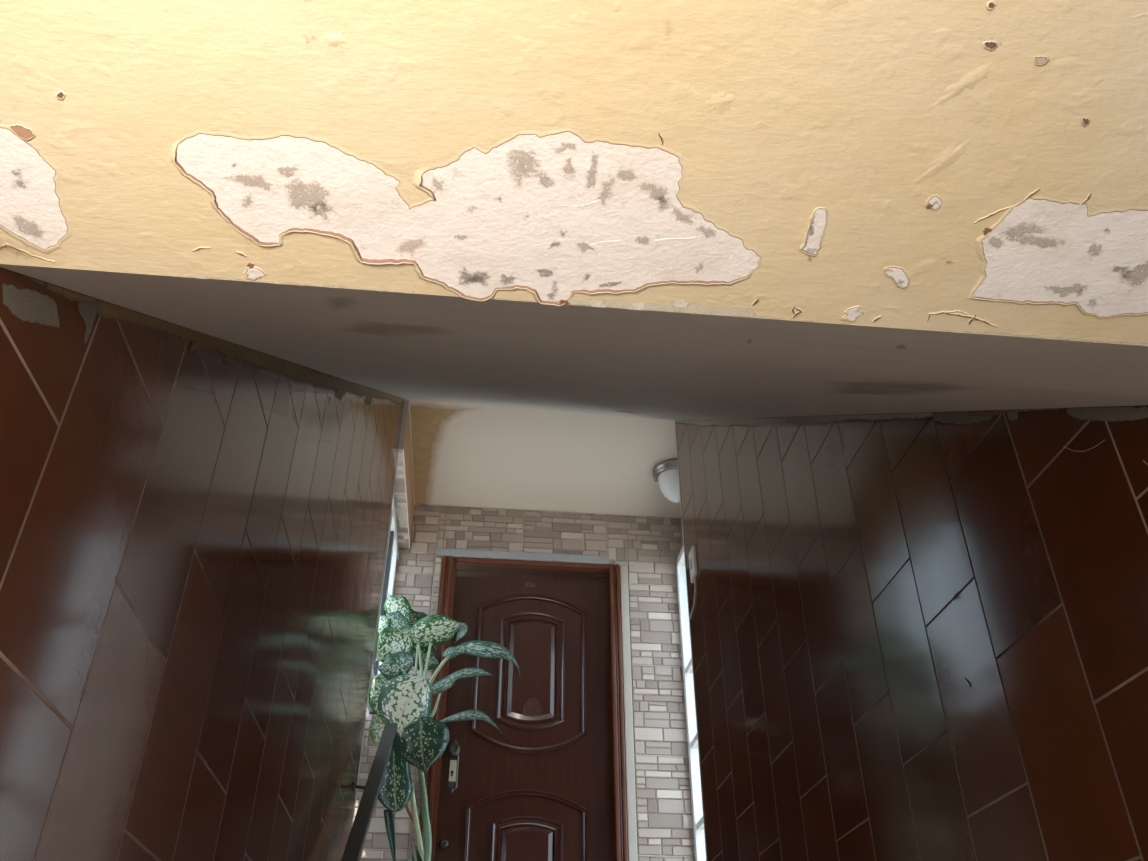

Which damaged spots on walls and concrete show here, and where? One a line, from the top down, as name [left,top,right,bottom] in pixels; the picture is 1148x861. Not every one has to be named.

peeling [0,119,73,255]
peeling [170,128,781,319]
peeling [799,207,829,261]
peeling [883,266,910,289]
peeling [967,188,1148,319]